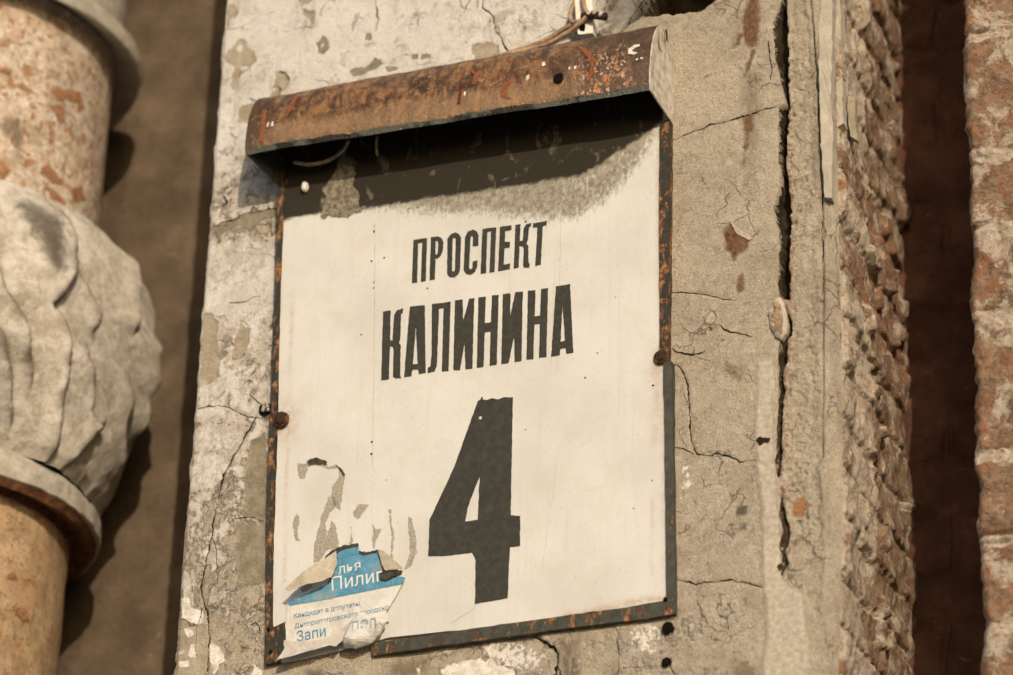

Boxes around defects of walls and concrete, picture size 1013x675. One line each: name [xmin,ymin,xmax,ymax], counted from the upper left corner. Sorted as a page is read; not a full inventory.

peeling [225,38,257,90]
peeling [316,35,329,54]
peeling [350,57,398,76]
crack [464,0,508,51]
rust [735,0,759,71]
crack [813,24,824,341]
rust [724,220,752,260]
crack [673,0,793,588]
crack [195,395,265,675]
peeling [173,597,225,675]
peeling [441,643,515,675]
crack [535,637,561,675]